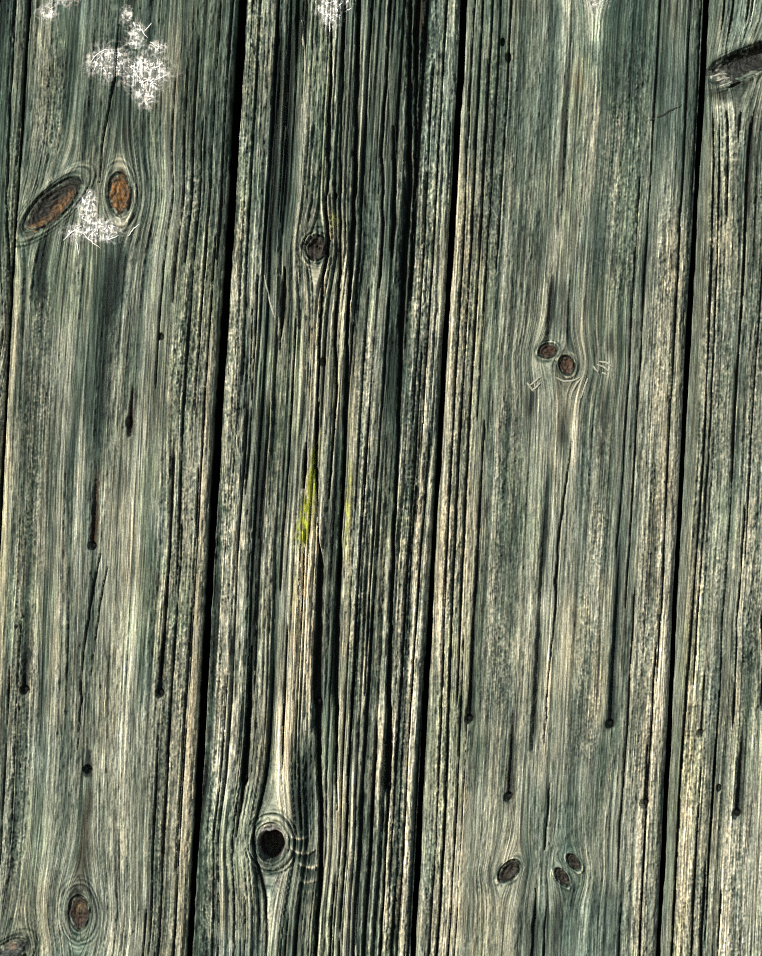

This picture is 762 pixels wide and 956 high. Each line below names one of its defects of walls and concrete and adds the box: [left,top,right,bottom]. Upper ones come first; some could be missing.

crack [616,0,762,956]